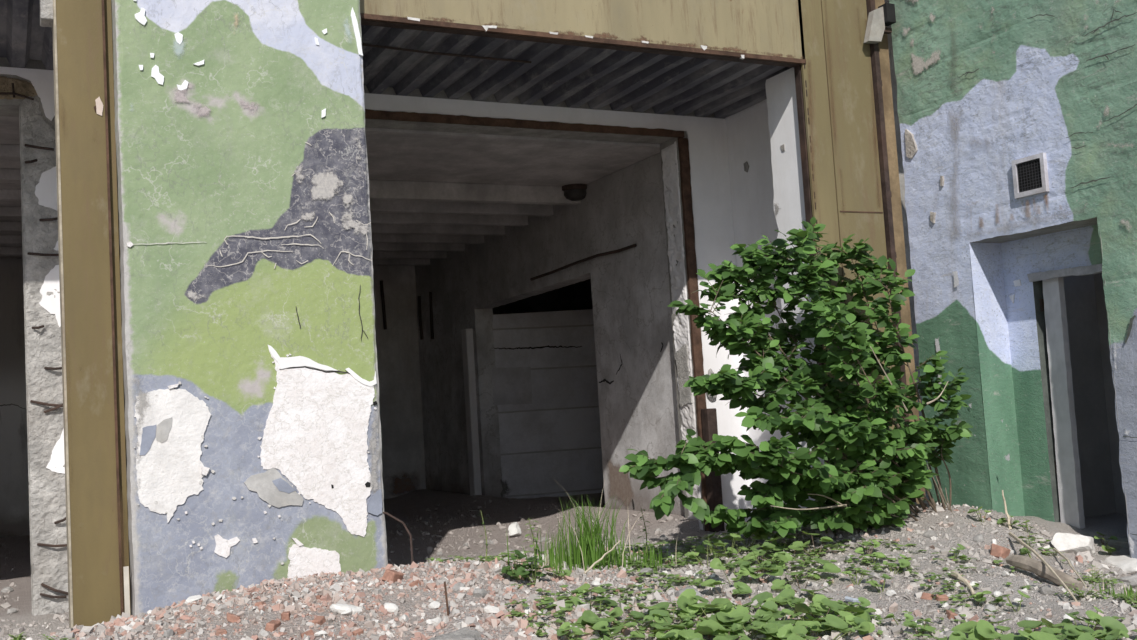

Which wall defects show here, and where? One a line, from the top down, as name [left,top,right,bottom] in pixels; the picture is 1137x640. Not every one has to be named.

peeling [133,0,147,25]
peeling [139,53,164,85]
peeling [174,32,183,54]
peeling [345,7,363,56]
spalling [903,27,941,75]
crack [1085,9,1137,61]
peeling [294,165,369,234]
spalling [0,76,69,616]
crack [494,343,582,351]
peeling [134,380,215,523]
peeling [232,345,413,564]
peeling [189,519,258,558]